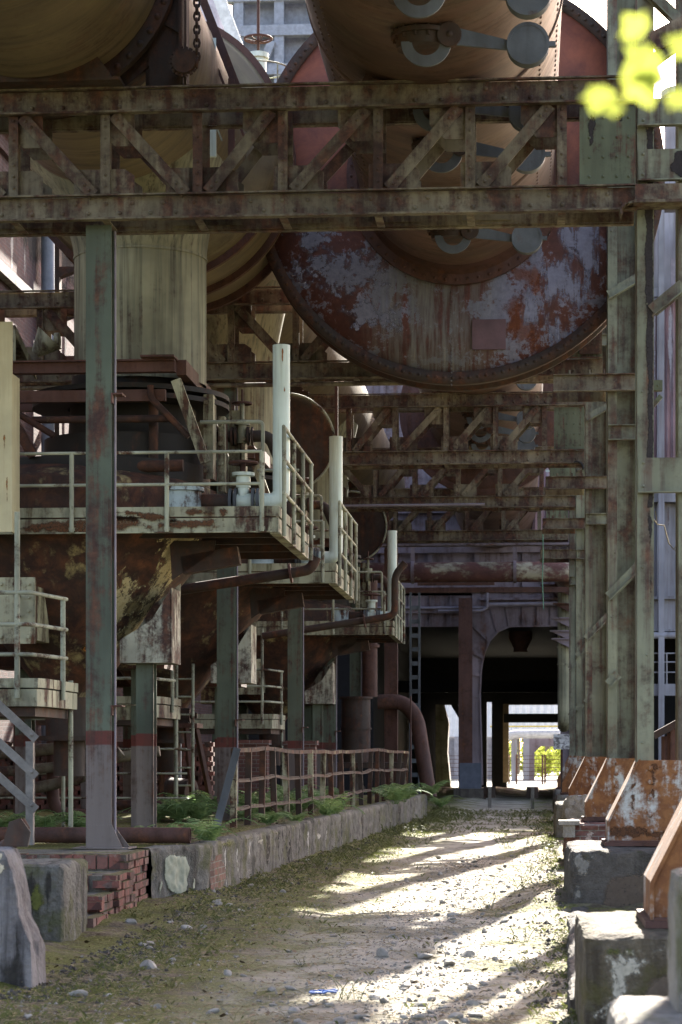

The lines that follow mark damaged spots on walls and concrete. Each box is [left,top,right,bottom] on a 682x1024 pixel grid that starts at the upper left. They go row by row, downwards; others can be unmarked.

peeling [291,231,402,331]
rust [507,268,545,350]
peeling [523,227,599,345]
rust [23,519,86,533]
rust [117,508,227,531]
rust [610,826,665,841]